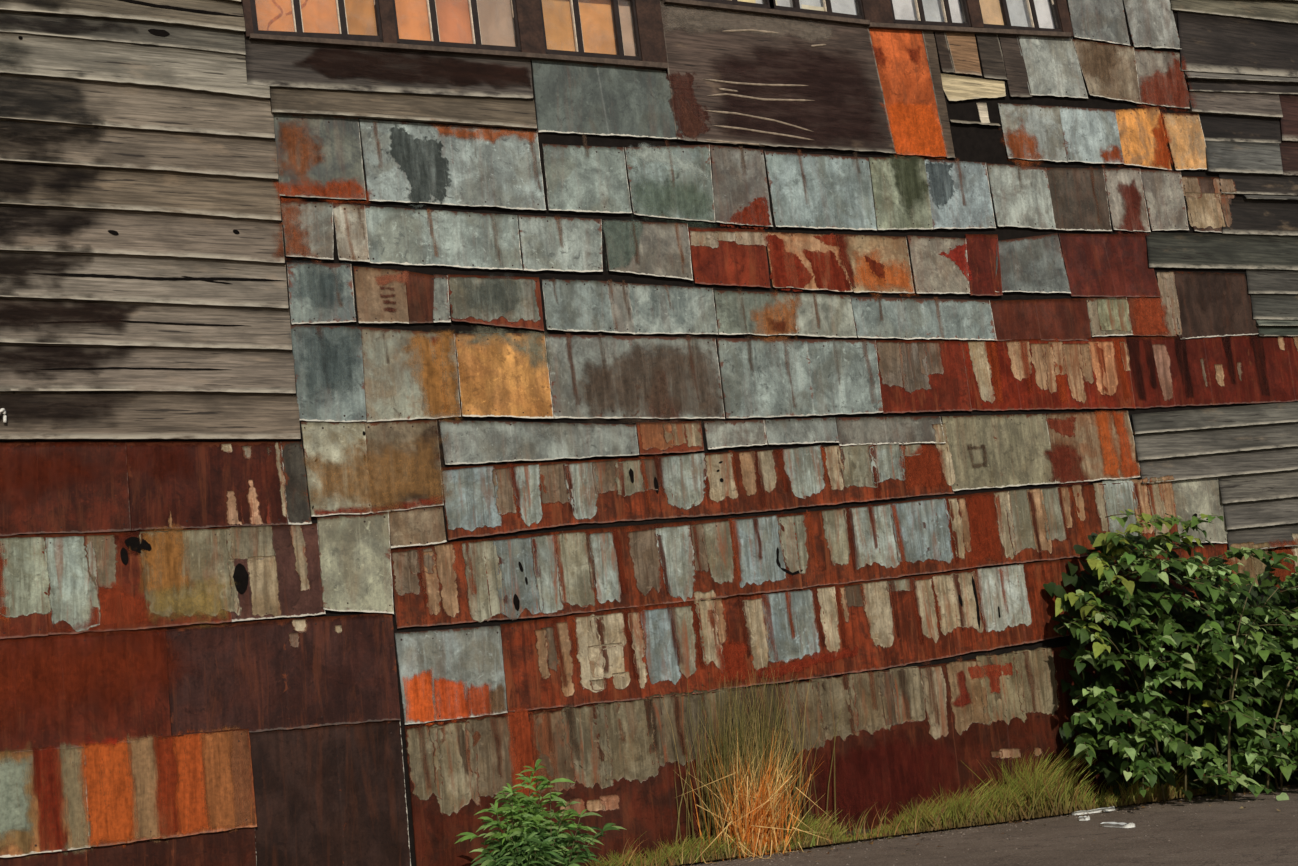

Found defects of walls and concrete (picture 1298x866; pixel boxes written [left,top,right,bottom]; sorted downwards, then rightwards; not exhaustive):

damp [381,124,452,210]
rust [1006,129,1041,176]
rust [1091,146,1123,194]
rust [720,197,910,366]
rust [939,244,972,281]
peeling [876,342,944,393]
peeling [968,341,995,404]
peeling [1007,299,1132,403]
peeling [1200,358,1243,387]
peeling [0,535,118,632]
peeling [392,423,1177,816]
rust [0,727,255,856]